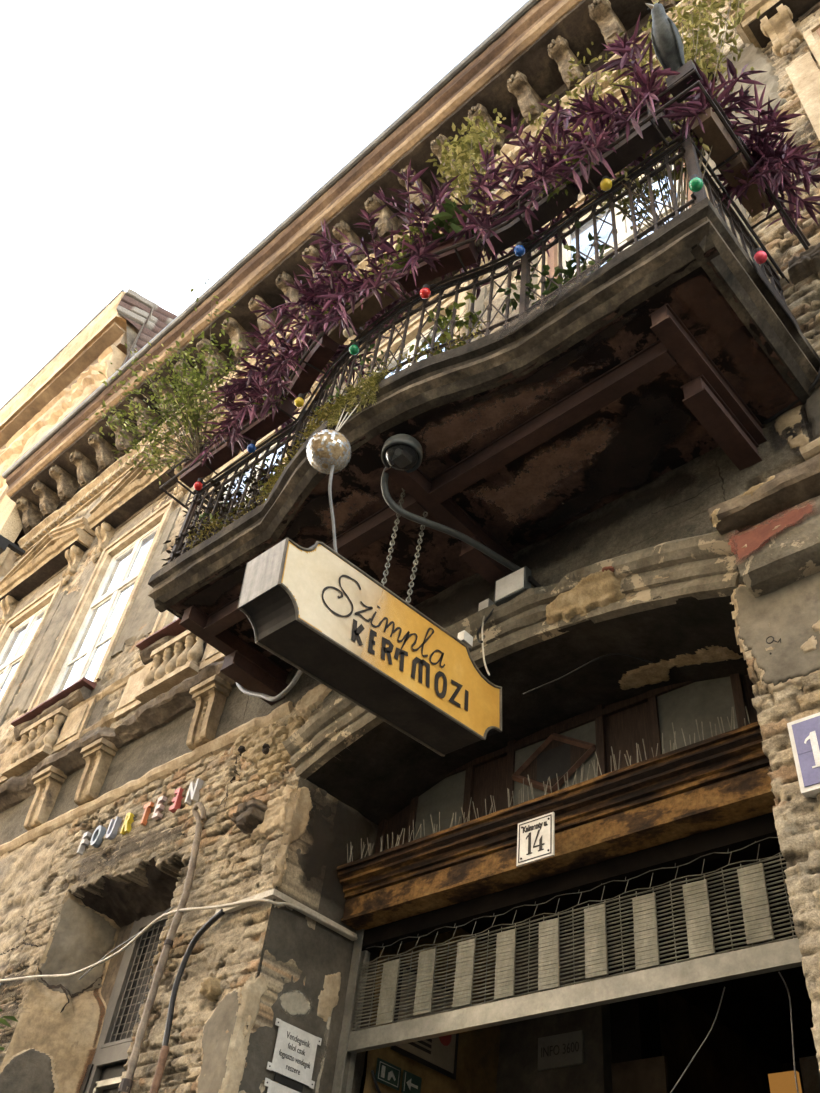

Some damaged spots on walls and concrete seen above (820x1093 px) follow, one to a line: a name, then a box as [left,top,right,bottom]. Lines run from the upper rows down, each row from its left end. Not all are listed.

spalling [775,405,810,449]
spalling [740,475,775,498]
peeling [728,502,814,562]
peeling [545,566,625,625]
peeling [618,571,820,694]
peeling [317,972,341,1022]
peeling [196,975,268,1093]
spalling [0,1048,59,1093]